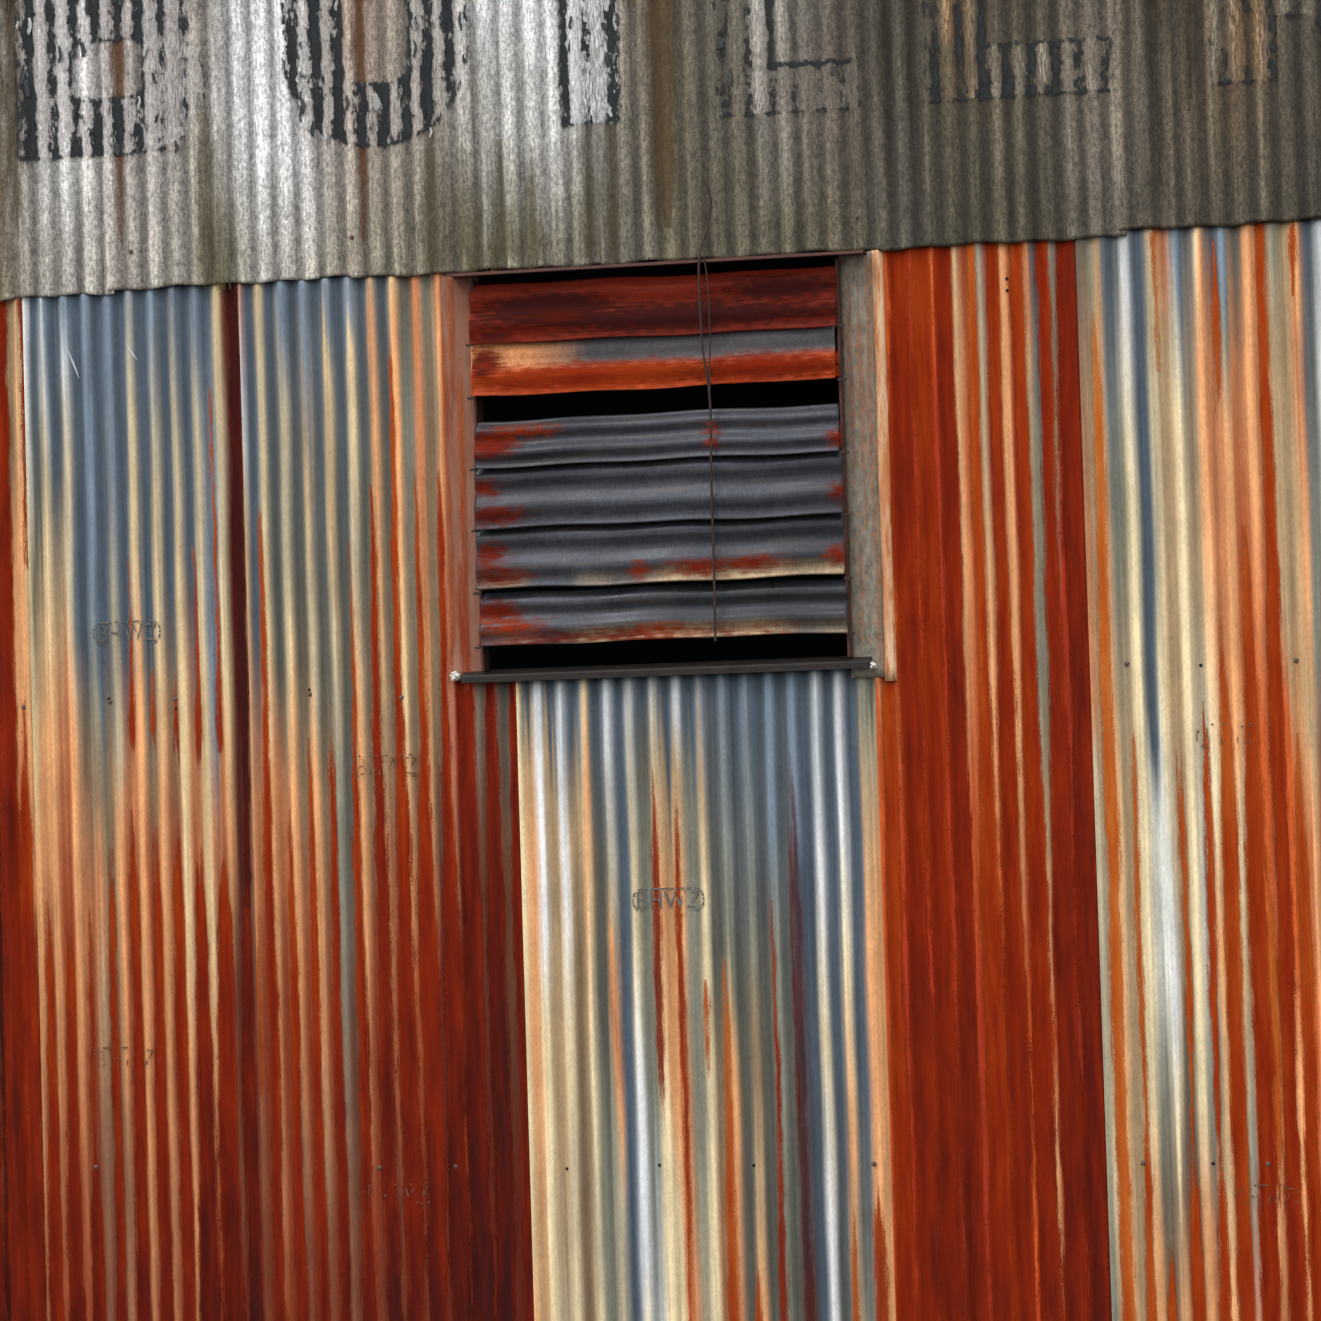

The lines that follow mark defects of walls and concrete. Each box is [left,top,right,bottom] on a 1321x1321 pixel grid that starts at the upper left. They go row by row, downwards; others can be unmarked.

peeling [12,0,206,163]
peeling [280,0,469,148]
peeling [557,0,622,128]
peeling [712,0,861,118]
peeling [922,0,1117,103]
peeling [1208,0,1321,86]
corrosion [0,274,839,1321]
corrosion [851,221,1321,1321]